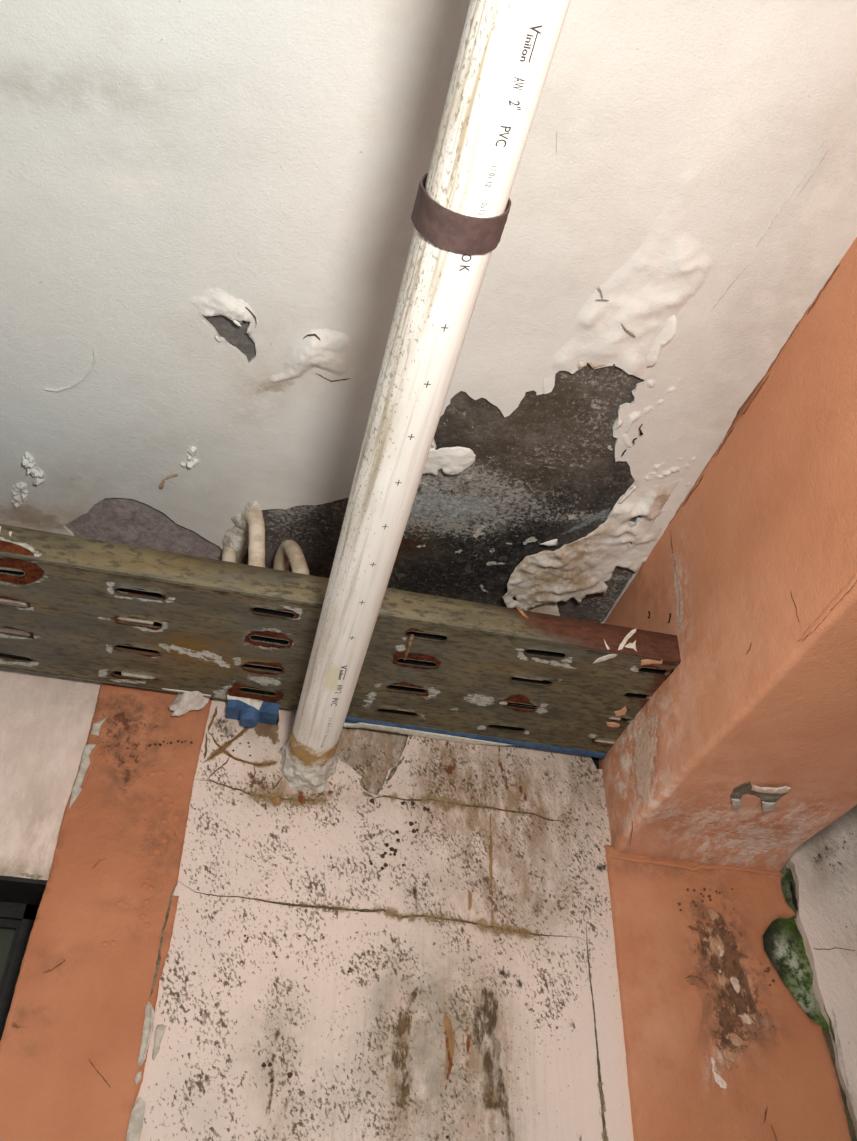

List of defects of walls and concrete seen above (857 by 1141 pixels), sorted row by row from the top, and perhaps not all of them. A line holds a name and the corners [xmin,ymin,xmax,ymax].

spalling [204,315,256,361]
spalling [387,361,696,623]
rust [0,537,48,611]
spalling [261,498,349,578]
crack [790,573,857,641]
rust [98,605,302,703]
rust [516,648,577,669]
leakage [215,719,341,767]
crack [370,794,572,822]
leakage [369,821,419,870]
crack [149,881,608,1141]
leakage [463,988,511,1141]